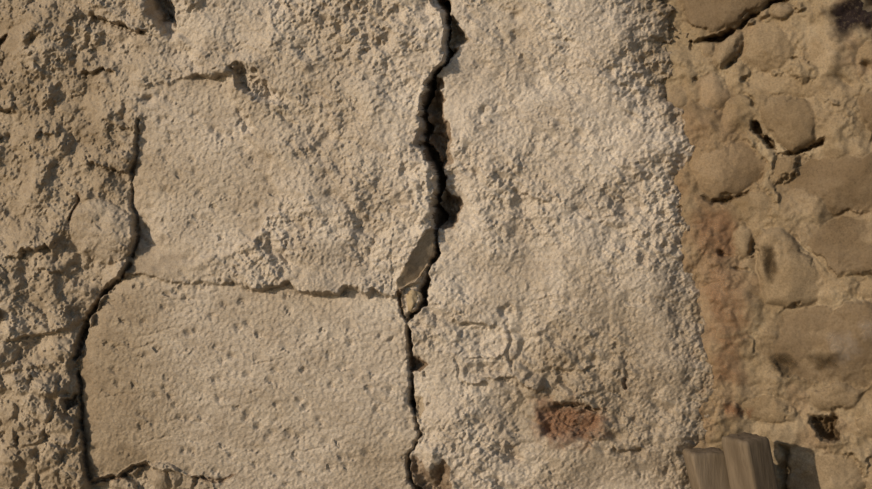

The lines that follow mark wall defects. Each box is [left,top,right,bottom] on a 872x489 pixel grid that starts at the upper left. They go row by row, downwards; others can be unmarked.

crack [67,191,81,223]
crack [75,120,149,484]
crack [187,473,237,483]
crack [396,0,470,489]